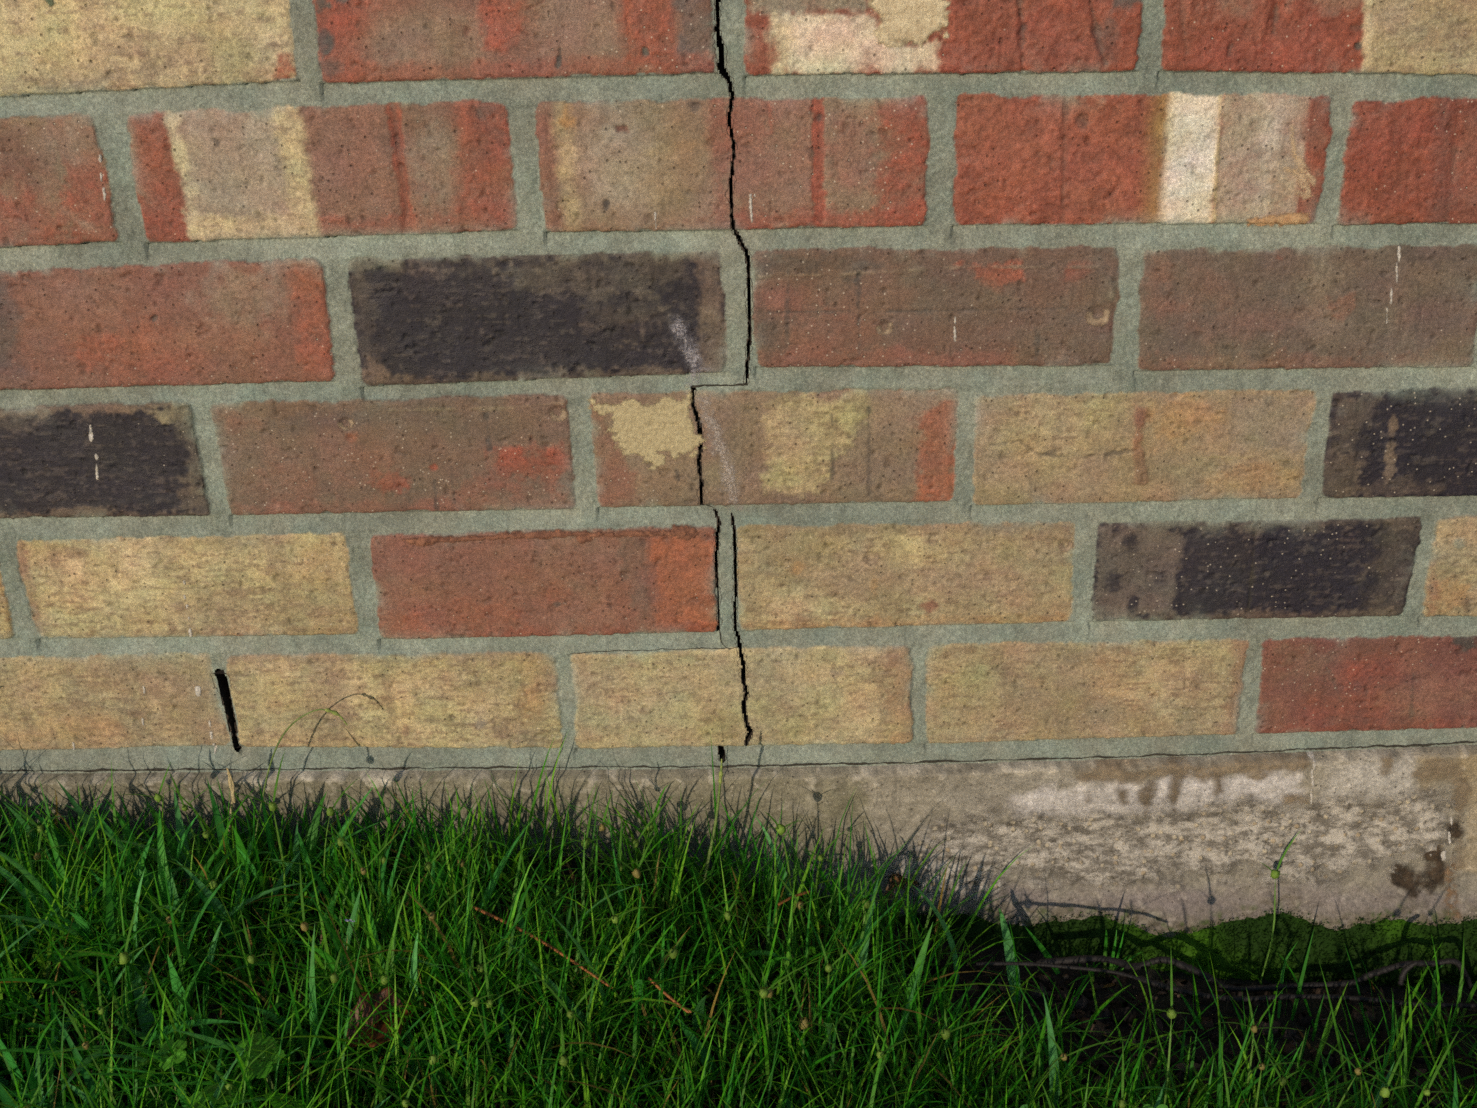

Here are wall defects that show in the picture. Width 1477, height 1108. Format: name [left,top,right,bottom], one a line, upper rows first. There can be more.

crack [0,0,1475,772]
damp [1079,752,1310,806]
damp [1391,760,1471,898]